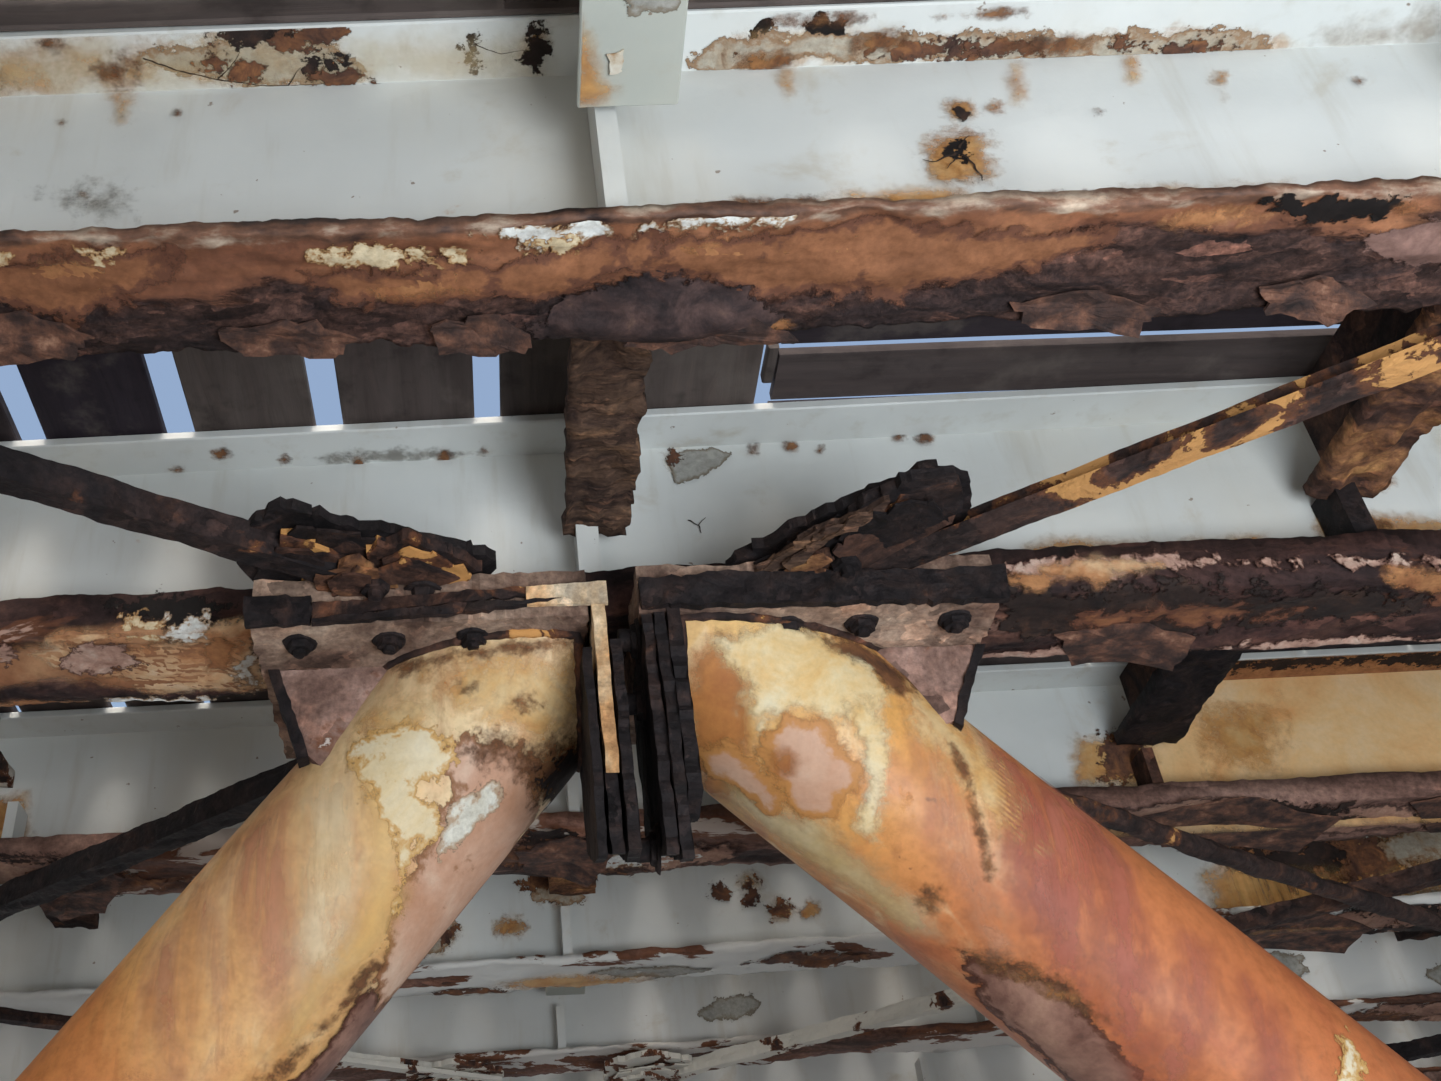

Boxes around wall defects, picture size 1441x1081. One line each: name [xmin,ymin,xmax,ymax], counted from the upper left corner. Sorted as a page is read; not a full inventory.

peeling [580,37,624,103]
peeling [623,0,681,17]
rust [400,638,586,906]
rust [690,645,747,797]
rust [801,628,1014,828]
rust [1075,651,1441,787]
peeling [345,715,613,1012]
rust [597,841,821,924]
peeling [609,1063,689,1081]
peeling [697,993,761,1022]
rust [954,861,1144,1081]
peeling [1269,951,1310,977]